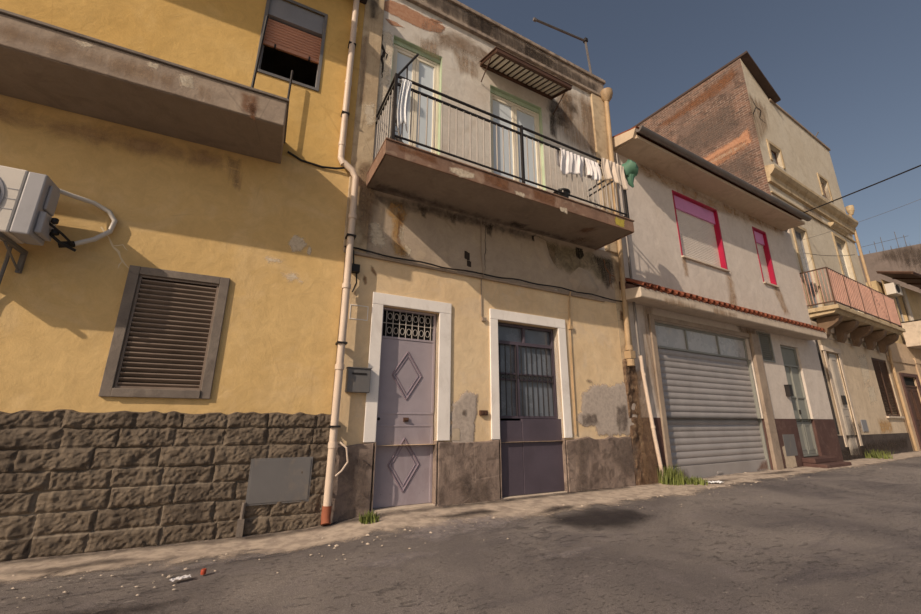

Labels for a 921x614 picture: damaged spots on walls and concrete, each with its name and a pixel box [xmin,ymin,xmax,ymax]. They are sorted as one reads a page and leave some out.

spalling [365,0,445,124]
damp [422,0,596,91]
damp [549,92,596,151]
damp [358,165,525,238]
damp [541,231,613,286]